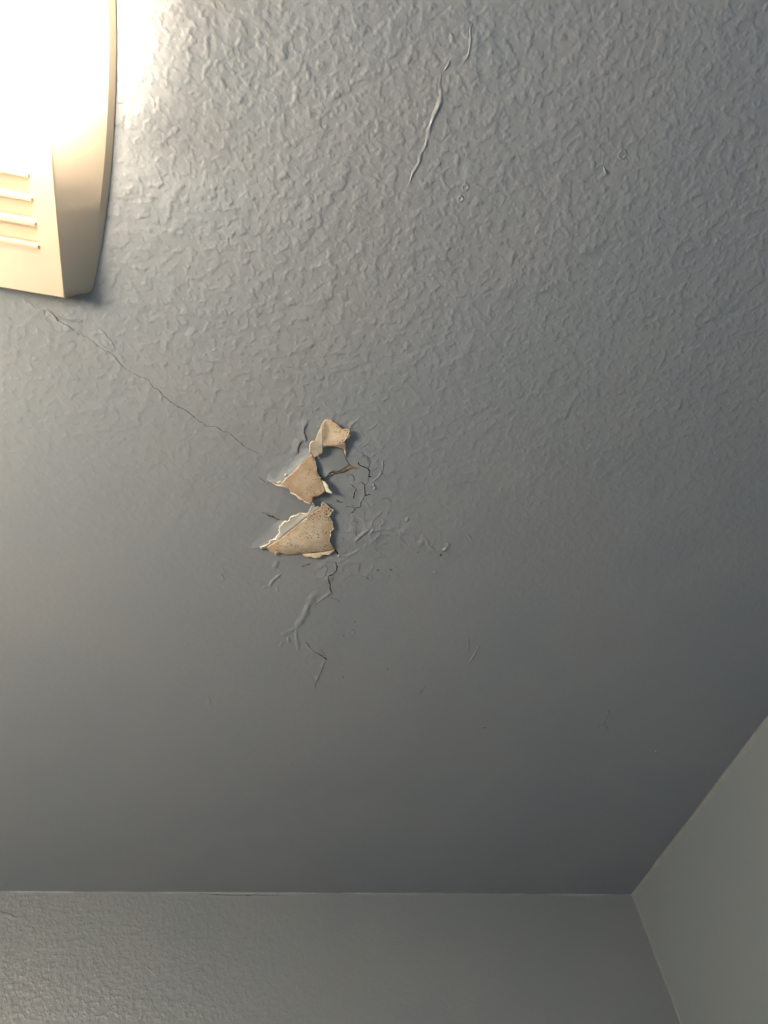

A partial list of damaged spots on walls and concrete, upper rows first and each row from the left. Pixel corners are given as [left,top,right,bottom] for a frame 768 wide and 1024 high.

crack [22,297,258,453]
peeling [251,416,377,558]
crack [302,455,377,606]